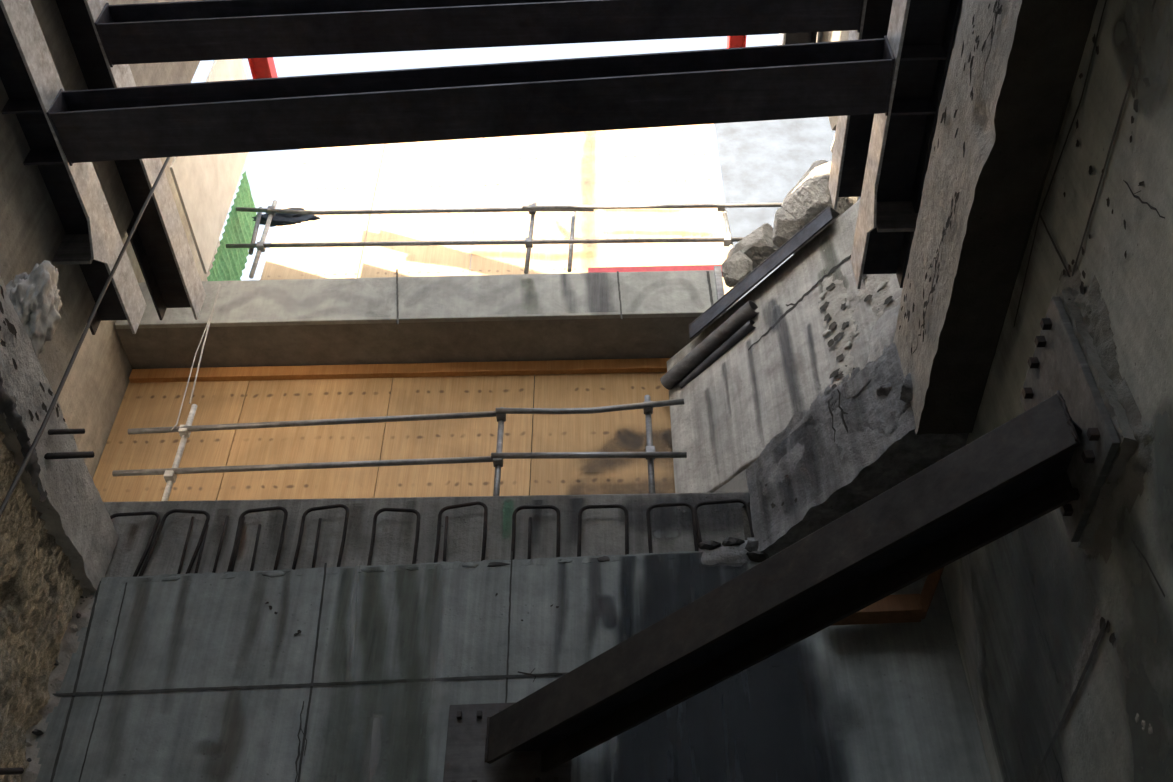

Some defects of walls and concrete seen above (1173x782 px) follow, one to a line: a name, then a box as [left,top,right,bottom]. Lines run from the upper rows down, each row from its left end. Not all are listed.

crack [979,0,1000,99]
spalling [0,286,17,370]
spalling [0,371,95,502]
leakage [747,341,756,389]
crack [751,255,851,347]
crack [828,365,854,442]
spalling [817,192,960,390]
leakage [338,567,383,684]
crack [295,701,307,782]